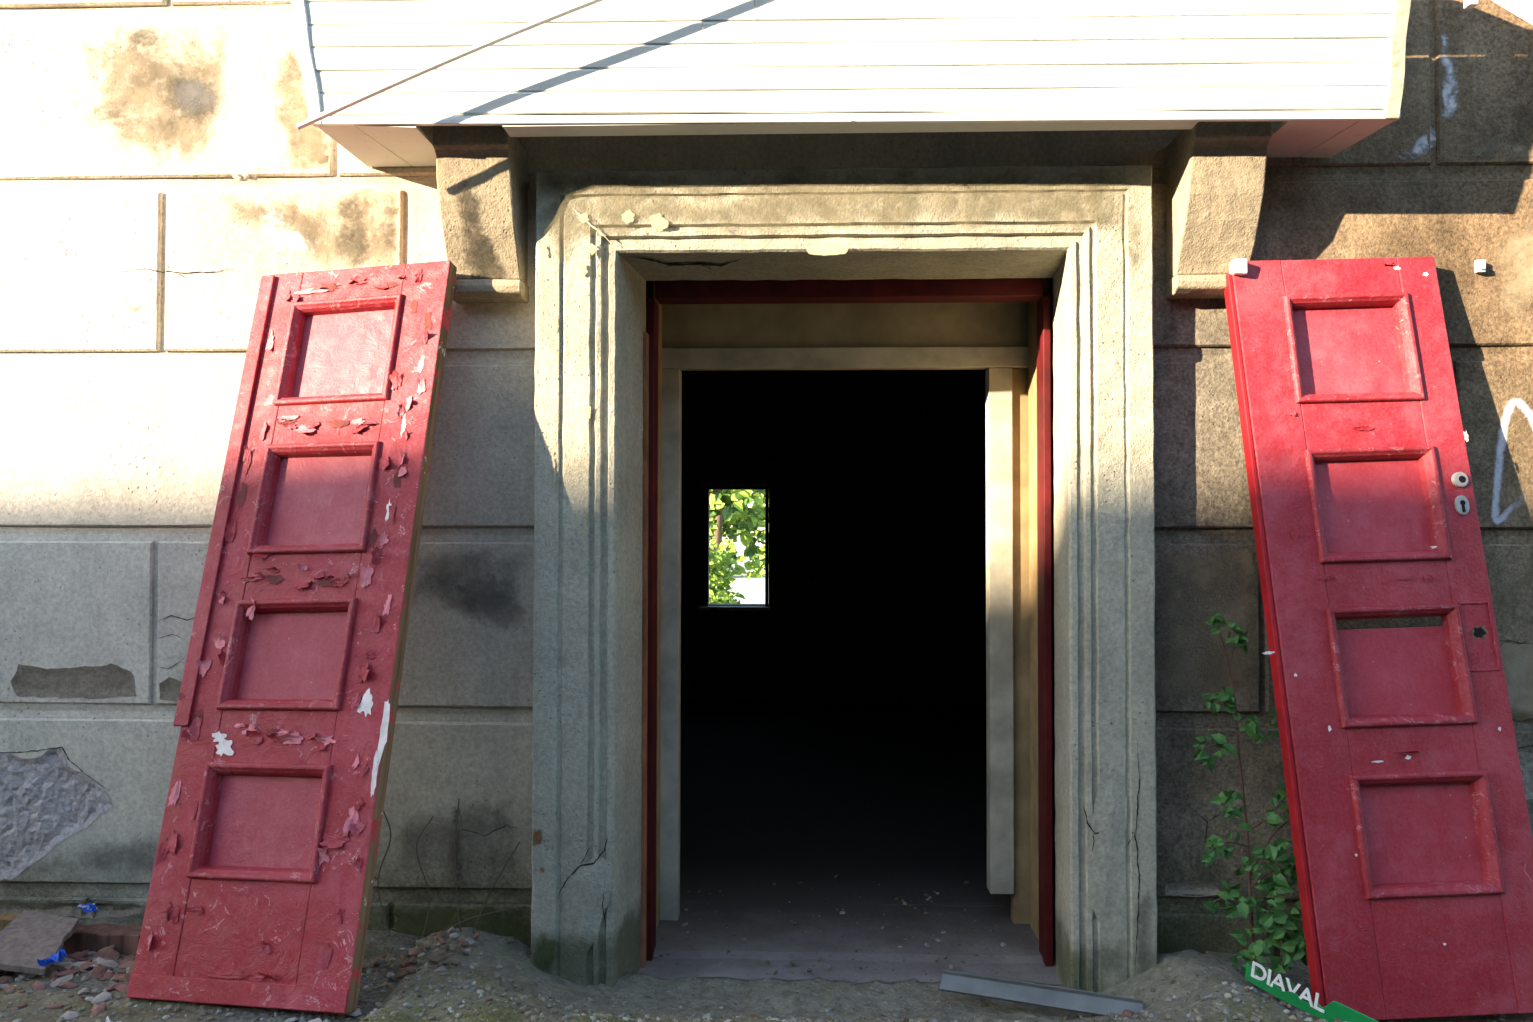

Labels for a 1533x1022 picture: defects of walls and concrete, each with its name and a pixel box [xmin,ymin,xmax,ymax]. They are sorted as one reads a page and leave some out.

water stain [1442,37,1457,116]
water stain [88,0,396,263]
water stain [1400,133,1436,158]
water stain [457,185,502,279]
crack [572,208,740,269]
spalling [11,663,136,699]
peeling [1469,625,1533,732]
spalling [0,747,113,881]
spalling [0,899,145,919]
crack [559,833,609,925]
crack [1084,741,1140,972]
spalling [1518,751,1533,800]